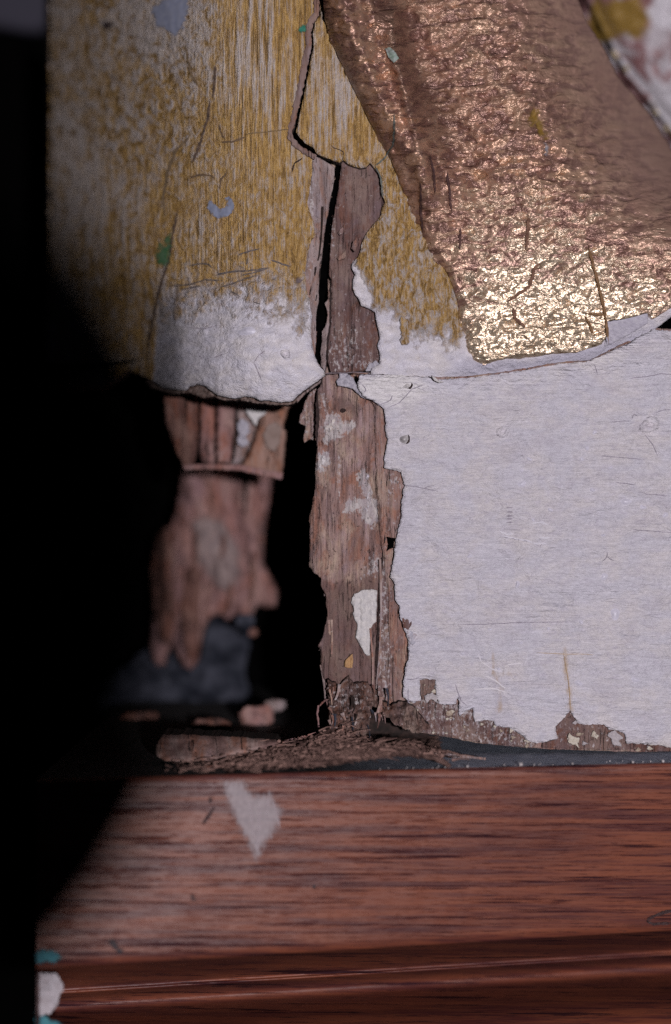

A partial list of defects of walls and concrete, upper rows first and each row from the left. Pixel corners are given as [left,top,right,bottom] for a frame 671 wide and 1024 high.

crack [147,0,344,357]
crack [375,116,395,197]
spalling [0,157,671,752]